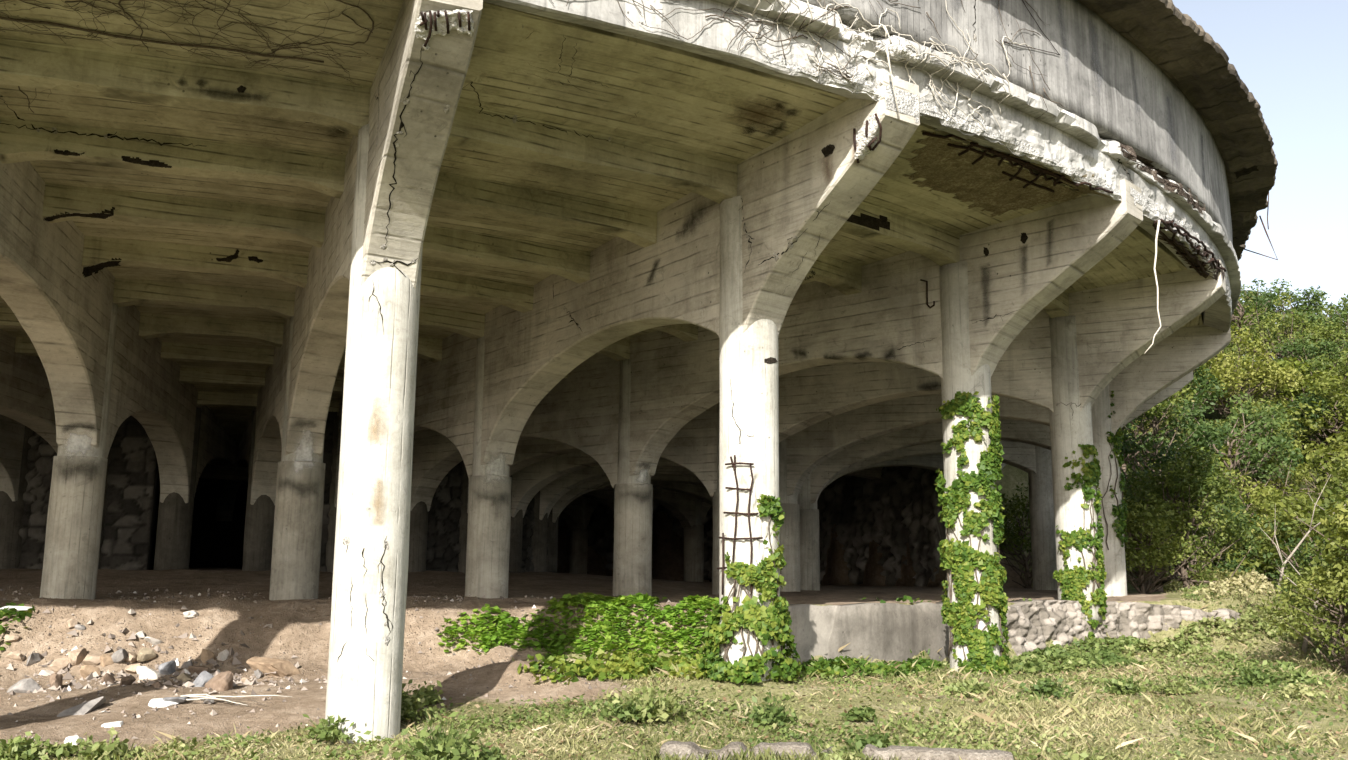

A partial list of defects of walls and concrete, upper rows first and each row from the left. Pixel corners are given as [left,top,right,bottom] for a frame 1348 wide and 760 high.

spalling [414,9,474,50]
crack [0,95,202,147]
crack [444,82,637,141]
spalling [121,156,172,168]
spalling [764,52,1236,281]
crack [369,48,423,332]
spalling [43,207,115,221]
spalling [82,258,122,278]
spalling [216,249,263,263]